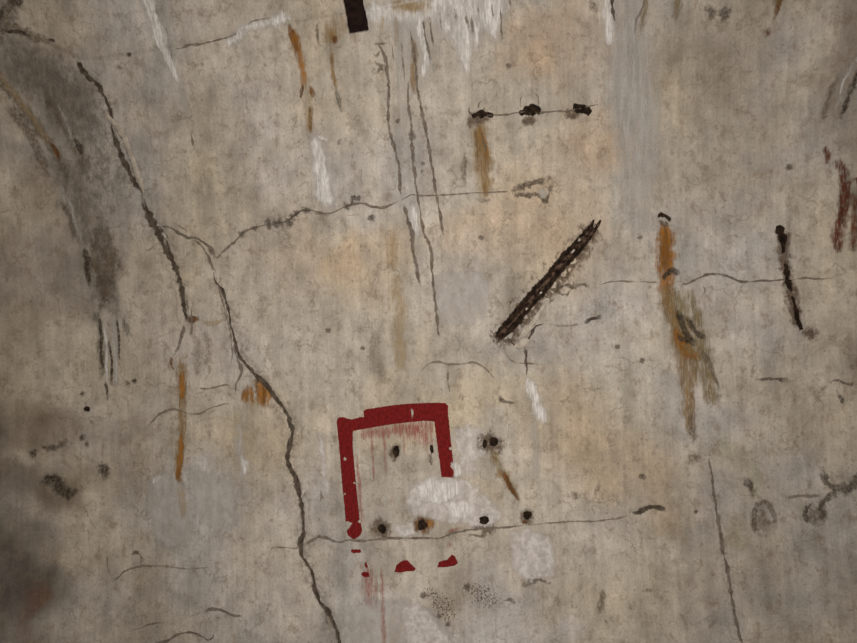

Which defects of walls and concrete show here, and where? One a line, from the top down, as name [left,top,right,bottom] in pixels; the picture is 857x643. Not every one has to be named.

rust [288,25,315,97]
damp [366,0,511,137]
rust [474,129,489,193]
damp [592,0,660,229]
rust [824,147,857,252]
crack [77,37,551,643]
crack [507,315,600,374]
rust [656,212,718,439]
crack [685,273,824,291]
rust [170,355,186,480]
crack [550,505,665,524]
crack [708,462,743,643]